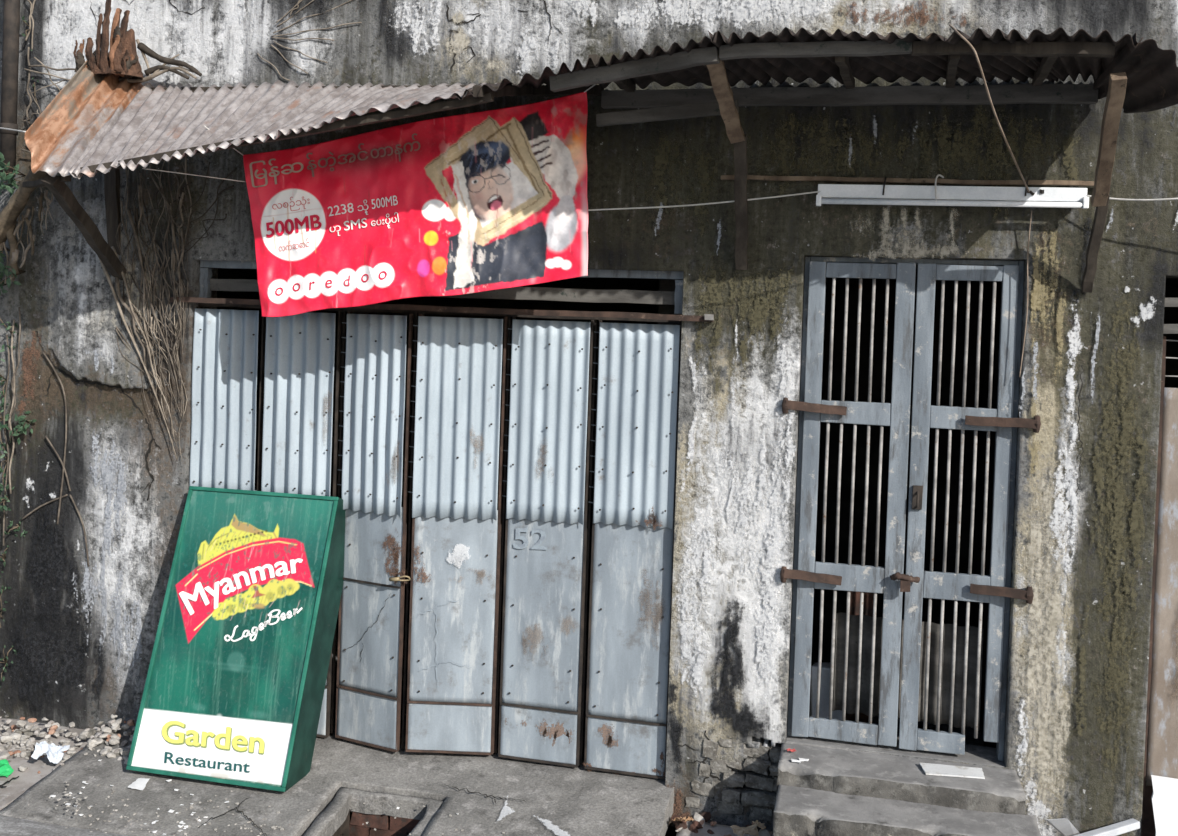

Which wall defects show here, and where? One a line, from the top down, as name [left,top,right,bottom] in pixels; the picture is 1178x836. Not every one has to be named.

leakage [379,0,441,59]
flaking render [395,1,470,57]
flaking render [478,30,560,77]
flaking render [569,0,598,27]
flaking render [614,9,641,29]
leakage [633,0,835,29]
crack [36,331,161,501]
leakage [632,130,796,737]
leakage [1019,218,1148,822]
leakage [7,434,143,713]
corrosion [383,532,431,585]
spalling [685,737,782,821]